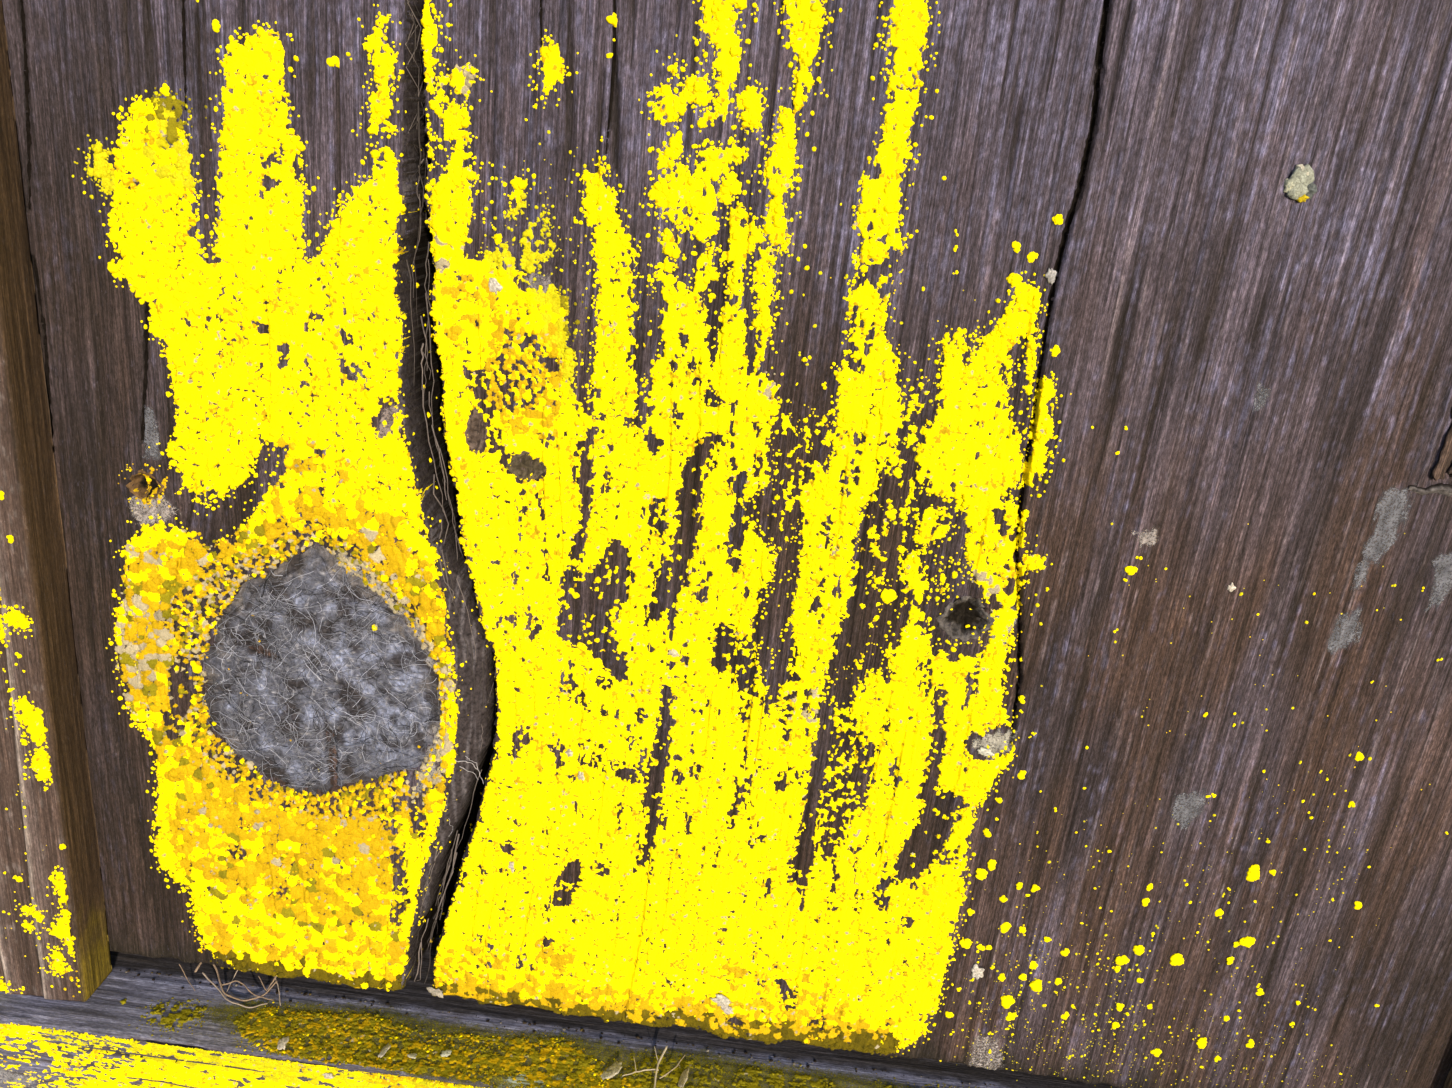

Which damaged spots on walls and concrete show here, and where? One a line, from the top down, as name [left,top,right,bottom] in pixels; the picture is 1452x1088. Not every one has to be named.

crack [392,0,498,988]
crack [1010,0,1110,743]
crack [1409,483,1452,496]